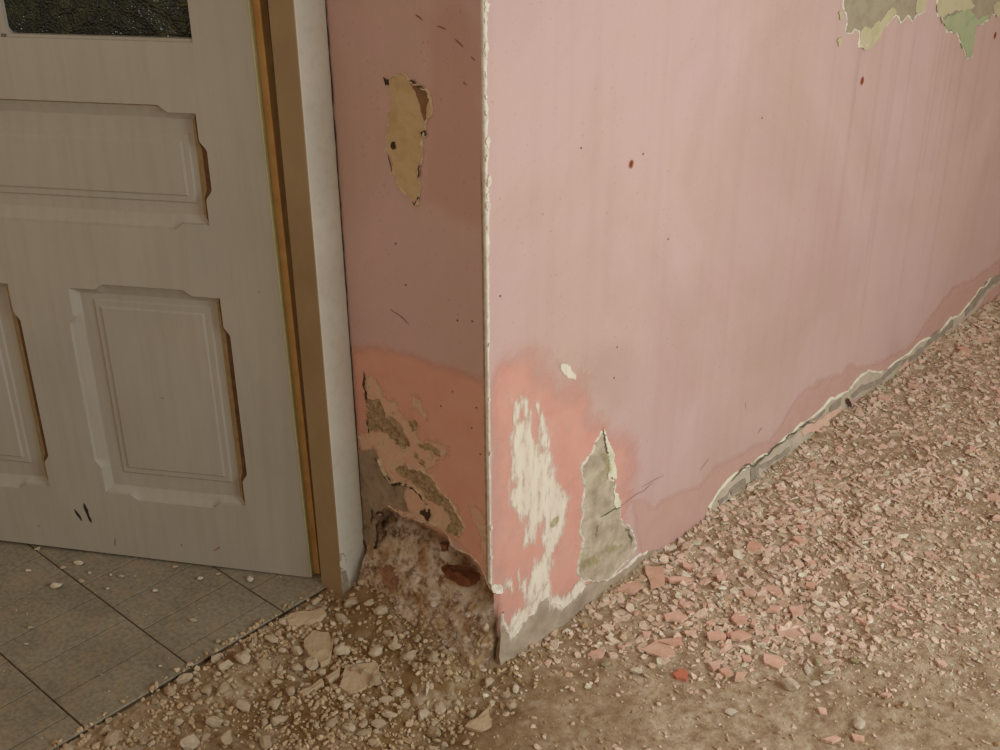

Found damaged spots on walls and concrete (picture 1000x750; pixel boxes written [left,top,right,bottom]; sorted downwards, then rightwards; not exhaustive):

peeling [837,0,1000,60]
spalling [74,0,674,750]
damp [353,261,1000,630]
spalling [708,273,1000,513]